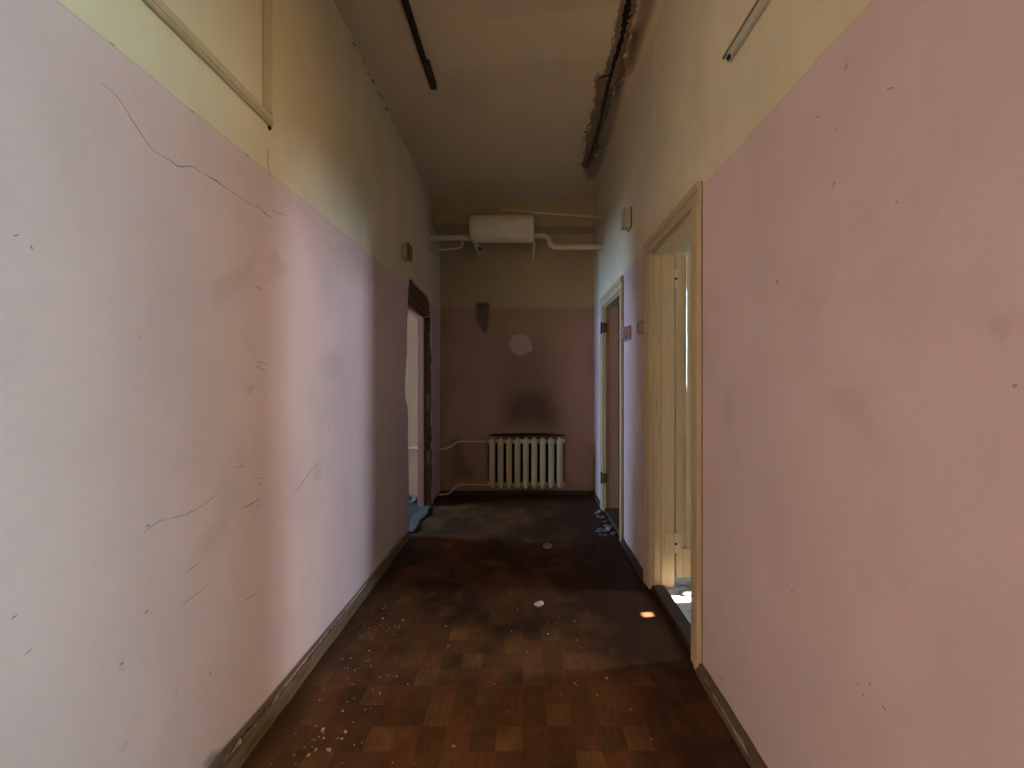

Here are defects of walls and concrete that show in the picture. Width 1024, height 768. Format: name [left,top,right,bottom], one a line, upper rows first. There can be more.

crack [101,83,286,218]
flaking render [580,0,640,168]